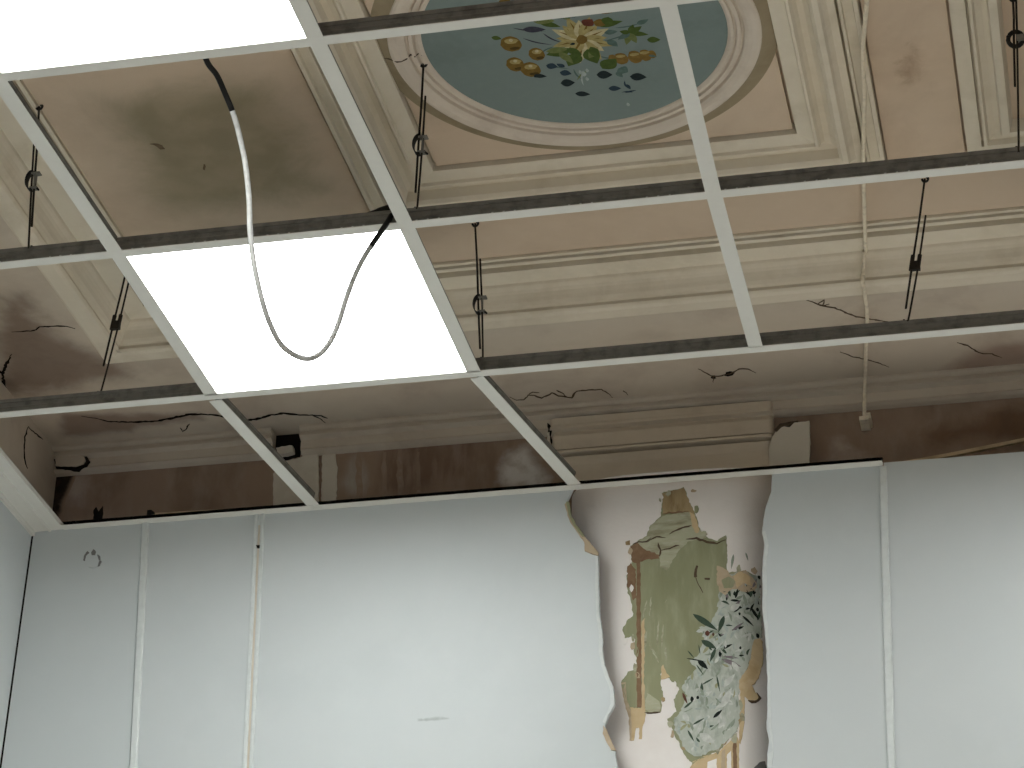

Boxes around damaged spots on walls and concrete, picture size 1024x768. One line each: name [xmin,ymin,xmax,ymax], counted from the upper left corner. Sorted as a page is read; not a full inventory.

crack [806,300,889,322]
crack [0,325,75,387]
crack [957,342,1001,358]
crack [699,368,755,381]
crack [510,389,628,401]
crack [82,412,328,432]
crack [24,426,42,469]
peeling [621,487,757,765]